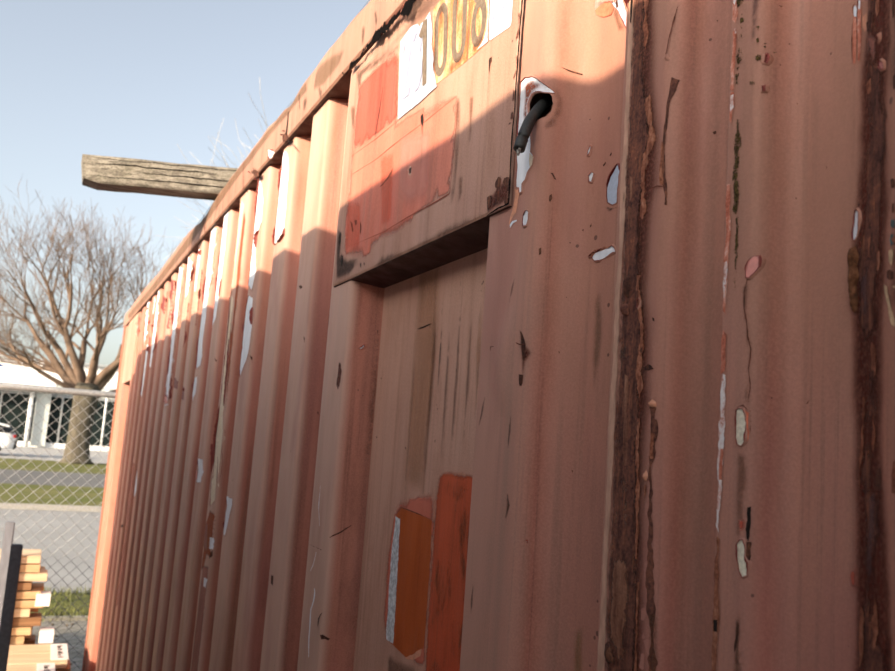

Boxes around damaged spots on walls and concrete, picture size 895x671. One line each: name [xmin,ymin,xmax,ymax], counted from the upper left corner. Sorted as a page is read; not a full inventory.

corrosion [386,0,429,24]
peeling [595,0,630,28]
peeling [851,0,868,64]
peeling [517,76,555,136]
peeling [267,130,290,245]
peeling [509,132,534,228]
peeling [606,163,620,210]
peeling [588,244,616,263]
peeling [723,184,731,312]
corrosion [604,0,656,671]
corrosion [854,0,895,671]
peeling [711,331,753,671]